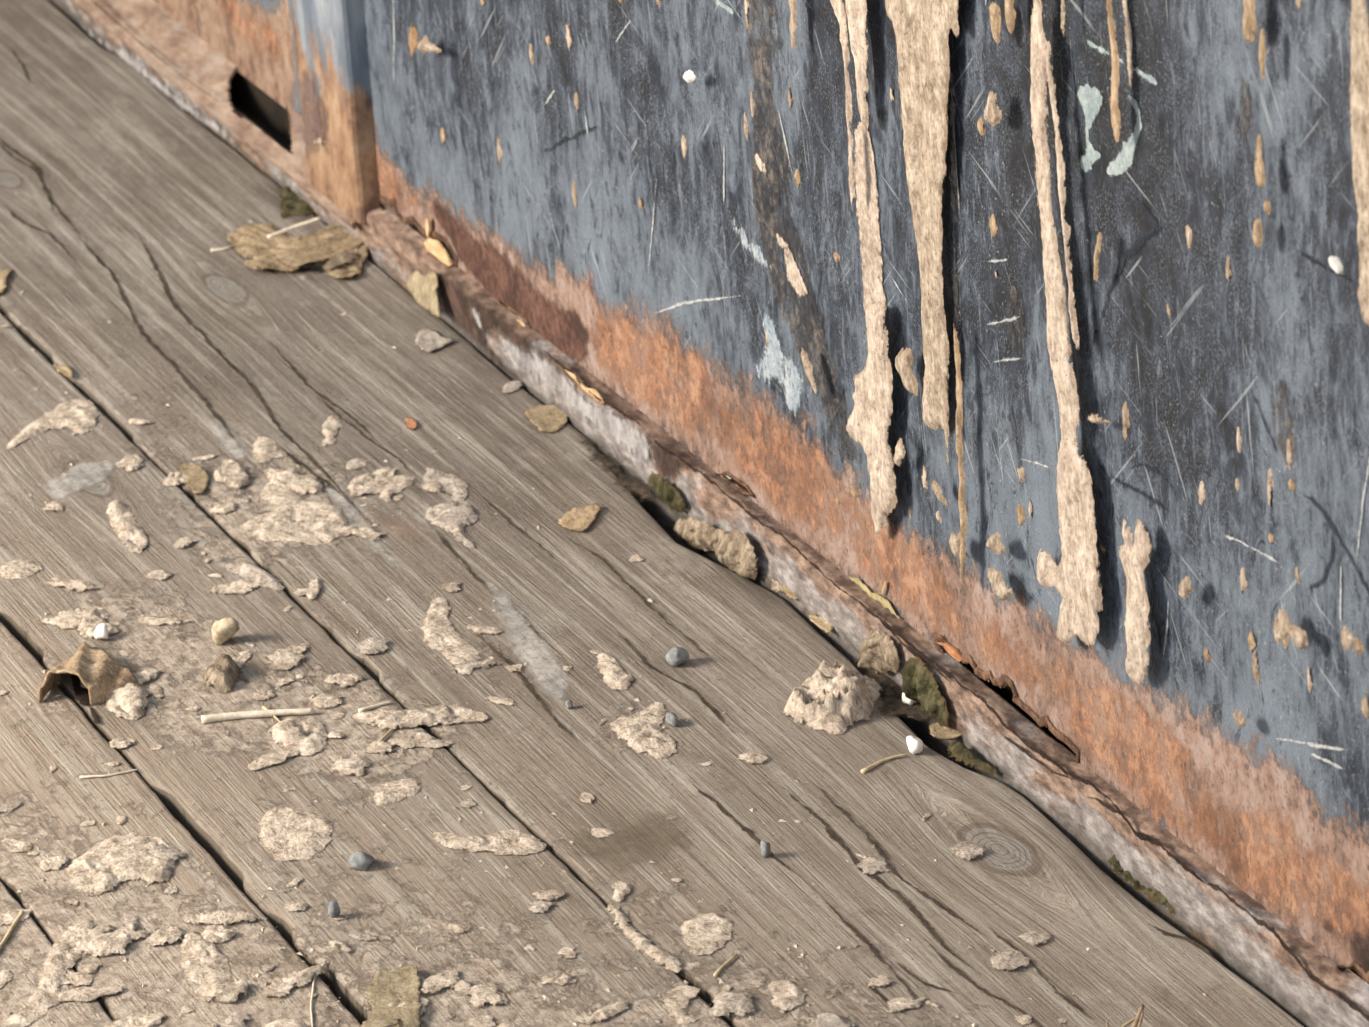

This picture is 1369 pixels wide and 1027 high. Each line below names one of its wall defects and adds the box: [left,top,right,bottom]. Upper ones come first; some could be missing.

rust [375,141,1369,973]